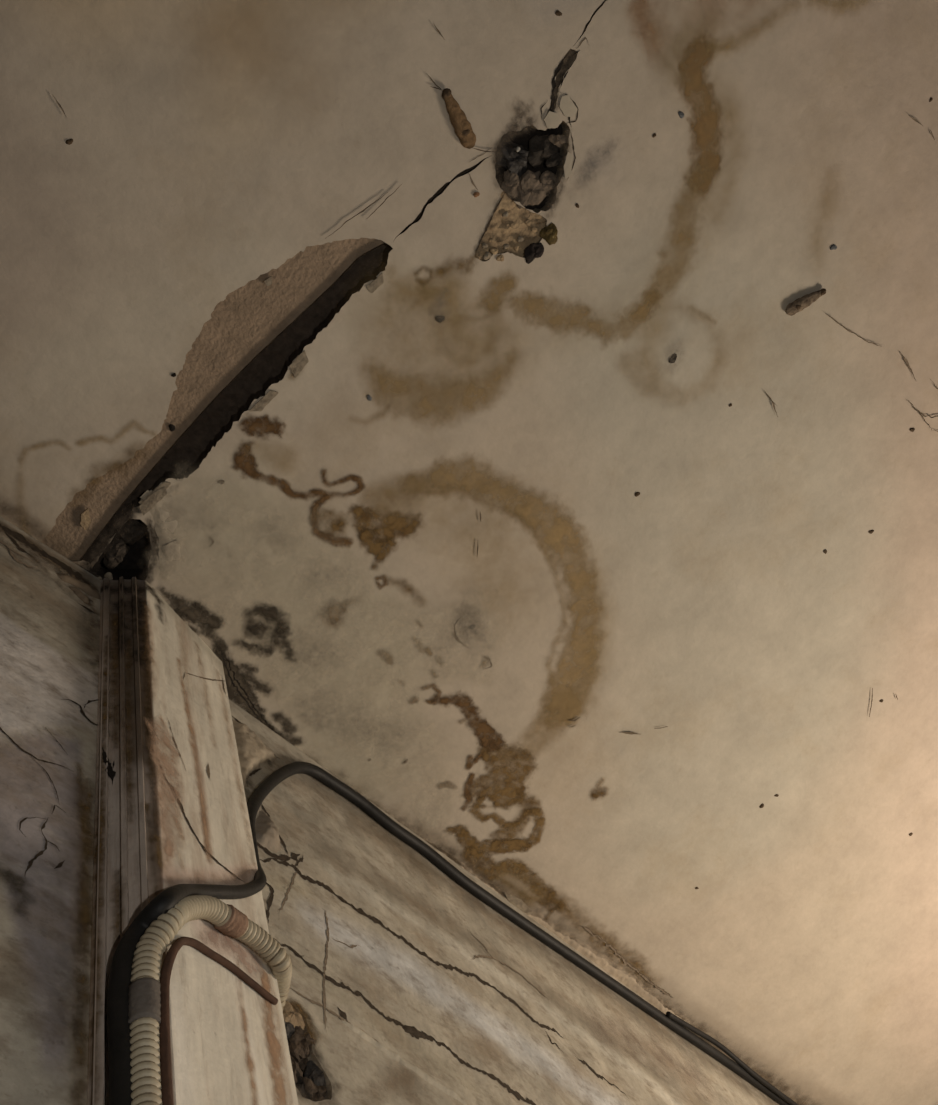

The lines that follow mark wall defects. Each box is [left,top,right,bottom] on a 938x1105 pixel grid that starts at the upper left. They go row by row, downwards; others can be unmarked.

crack [572,0,607,52]
crack [393,148,491,242]
hole [474,49,580,264]
leakage [672,36,732,246]
spalling [42,238,385,664]
leakage [482,268,678,338]
crack [828,315,938,432]
mould [161,588,302,746]
leakage [385,460,602,732]
crack [0,727,74,879]
crack [151,720,626,1105]
hole [283,1001,334,1104]